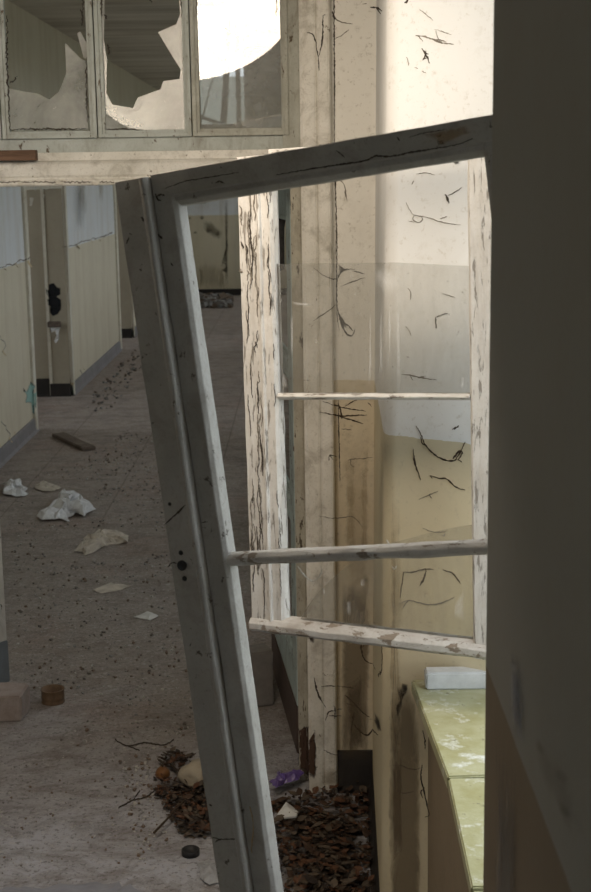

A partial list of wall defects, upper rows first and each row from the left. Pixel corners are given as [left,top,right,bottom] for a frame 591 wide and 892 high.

crack [238,0,473,609]
peeling [298,727,316,777]